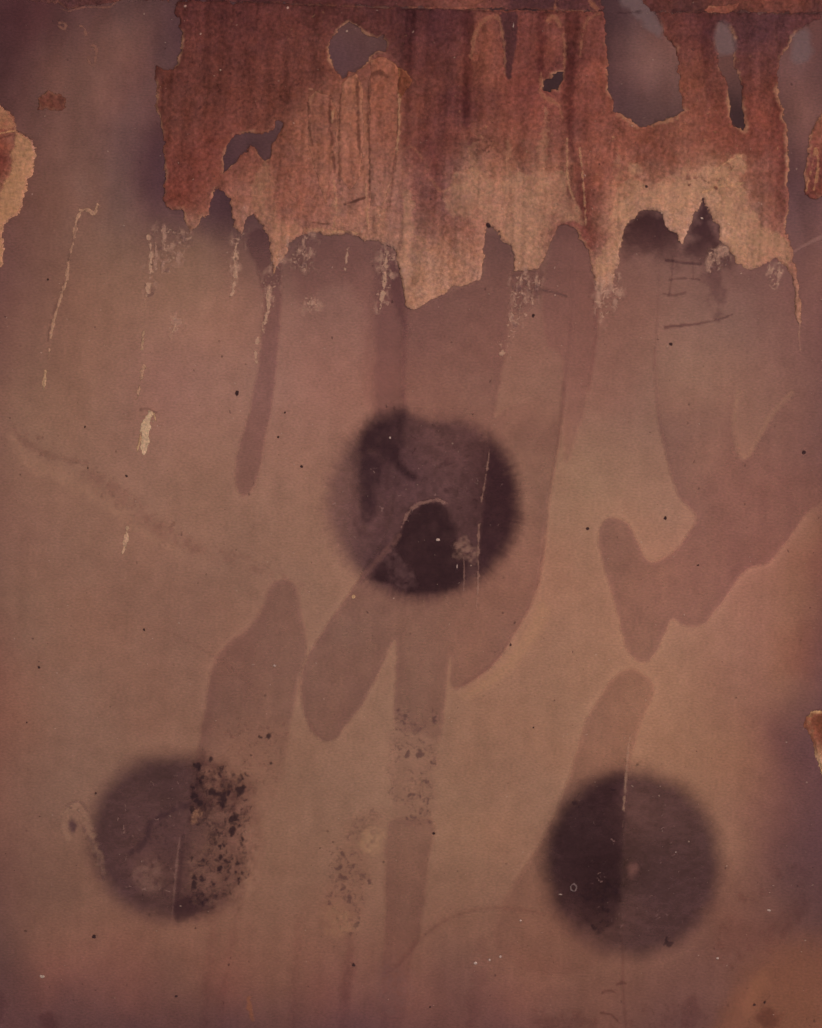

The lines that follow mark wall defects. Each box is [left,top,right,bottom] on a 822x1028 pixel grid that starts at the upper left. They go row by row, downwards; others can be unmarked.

peeling [704,3,739,14]
damp [190,229,561,906]
damp [513,425,819,897]